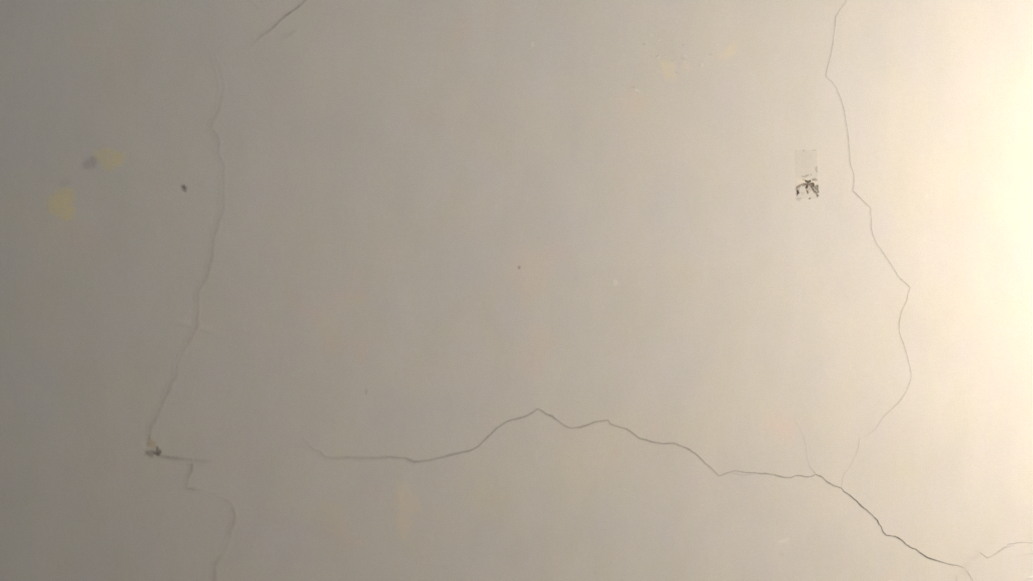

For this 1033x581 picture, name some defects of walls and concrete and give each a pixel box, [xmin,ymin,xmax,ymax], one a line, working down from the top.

crack [299,0,1033,581]